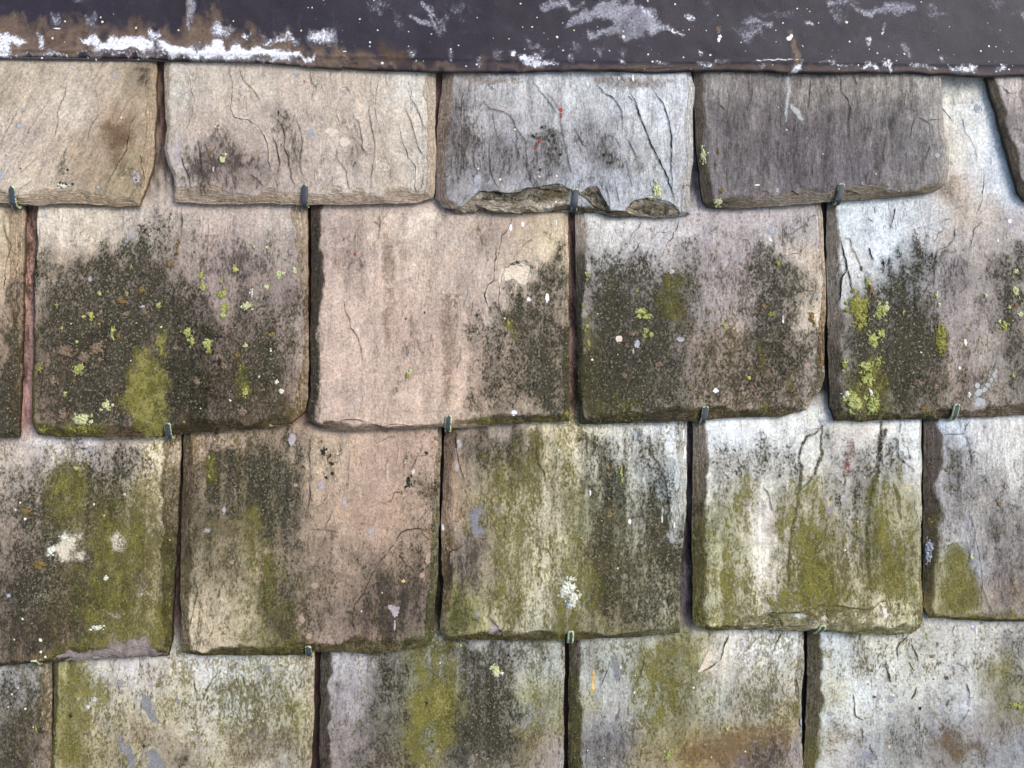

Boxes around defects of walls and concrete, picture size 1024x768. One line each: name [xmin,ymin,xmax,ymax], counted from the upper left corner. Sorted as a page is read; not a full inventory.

leakage [0,0,338,67]
leakage [398,2,458,34]
leakage [511,40,556,68]
leakage [540,0,682,63]
leakage [828,0,915,20]
crack [182,75,202,183]
crack [226,67,304,187]
crack [336,81,425,190]
spalling [460,172,610,213]
crack [454,67,679,368]
spalling [625,197,680,218]
leakage [803,427,824,487]